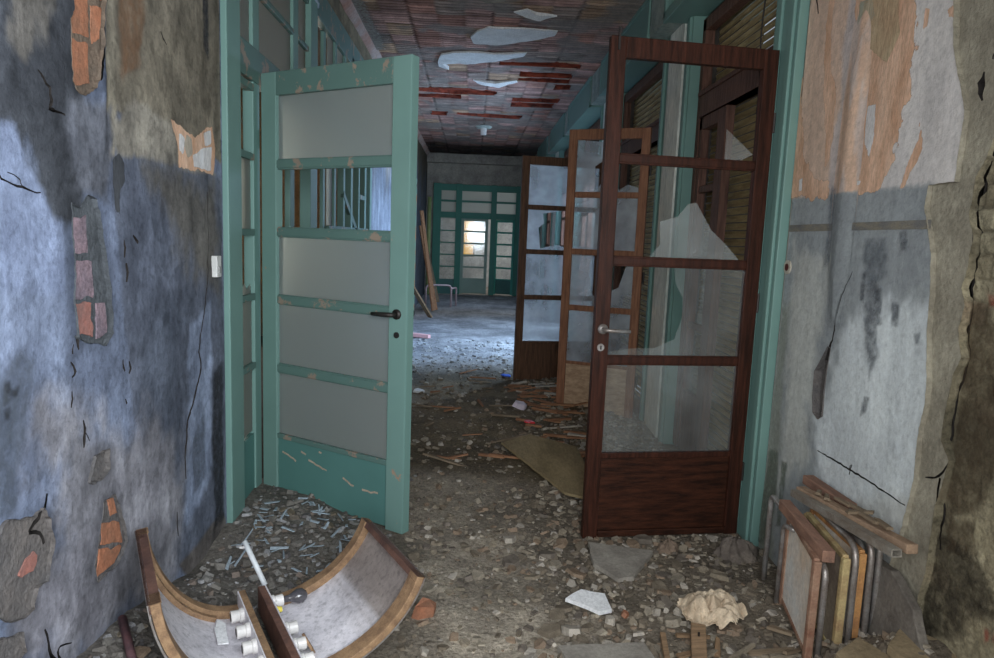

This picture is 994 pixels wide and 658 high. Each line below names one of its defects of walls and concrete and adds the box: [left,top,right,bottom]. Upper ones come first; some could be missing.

crack [0,172,41,194]
spalling [70,0,107,96]
peeling [171,119,215,175]
peeling [419,9,581,119]
peeling [855,0,930,195]
crack [978,54,994,101]
crack [184,278,208,478]
water stain [861,243,898,364]
flaking render [889,0,994,658]
crack [925,229,983,479]
crack [817,450,905,506]
spalling [0,508,56,658]